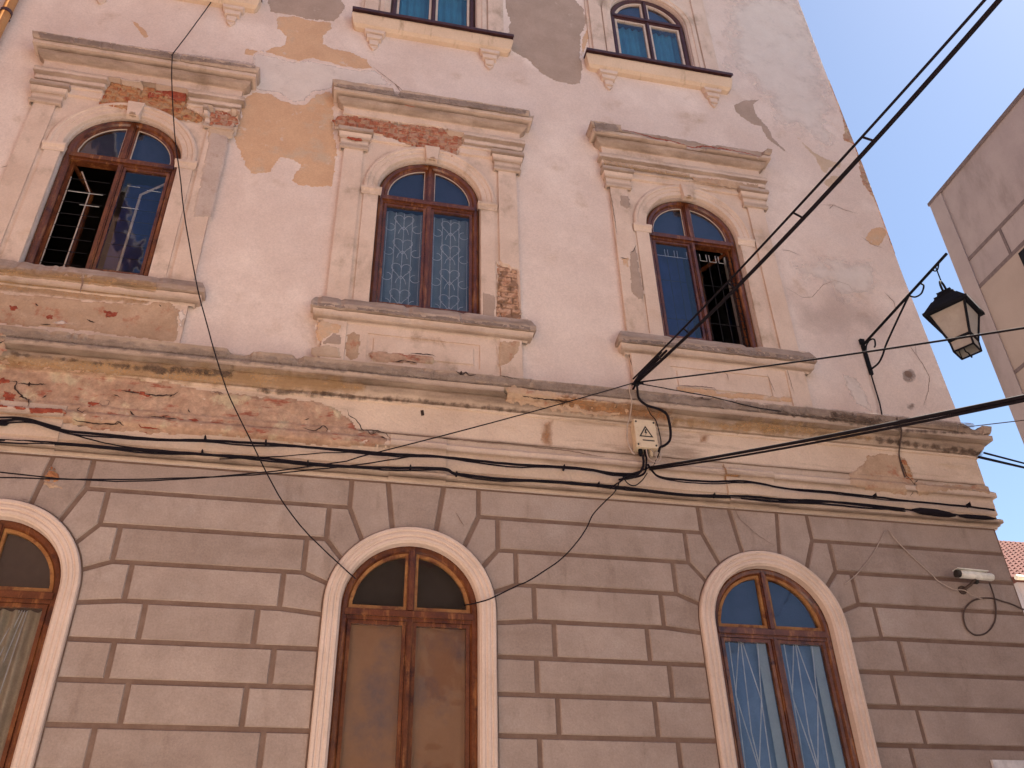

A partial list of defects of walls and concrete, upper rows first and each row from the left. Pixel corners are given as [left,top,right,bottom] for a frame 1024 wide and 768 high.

peeling [245,0,372,70]
flaking render [504,0,588,85]
peeling [98,82,463,217]
flaking render [733,98,793,156]
spalling [829,81,895,253]
flaking render [483,261,522,319]
crack [9,381,46,405]
crack [72,390,198,433]
flaking render [0,293,387,450]
spalling [311,332,437,366]
water stain [0,321,982,456]
flaking render [849,453,990,496]